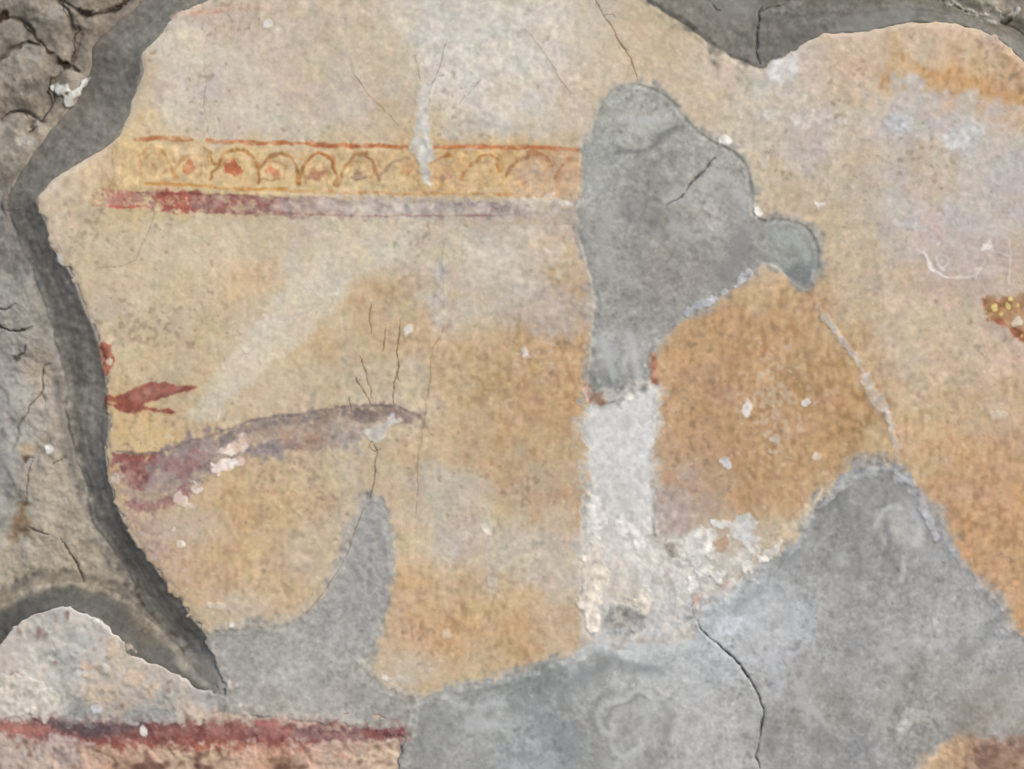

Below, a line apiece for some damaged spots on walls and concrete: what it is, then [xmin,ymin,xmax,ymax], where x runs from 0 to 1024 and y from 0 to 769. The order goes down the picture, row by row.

crack [595,0,638,81]
peeling [717,134,734,147]
peeling [763,80,857,131]
crack [665,157,716,206]
peeling [753,206,763,220]
crack [348,304,401,412]
crack [415,329,444,516]
peeling [717,453,732,471]
peeling [575,491,785,635]
crack [701,630,765,769]